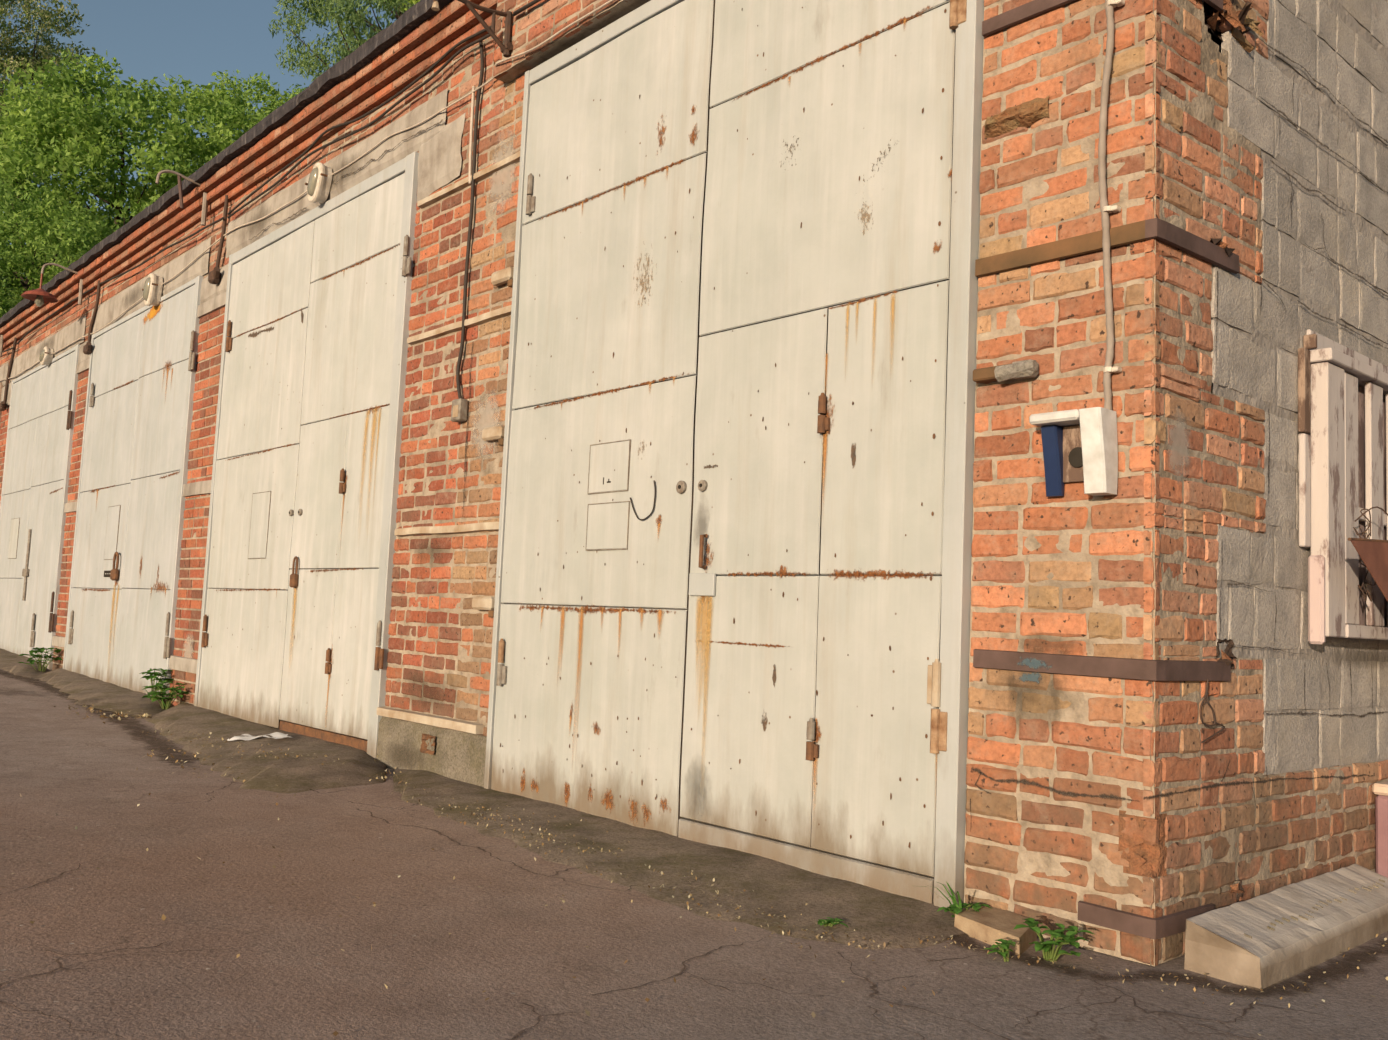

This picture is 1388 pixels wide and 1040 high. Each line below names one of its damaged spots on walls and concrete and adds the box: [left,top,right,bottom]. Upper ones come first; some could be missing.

rust [829,291,897,332]
rust [820,394,833,483]
rust [728,549,806,601]
rust [519,588,676,680]
rust [520,769,538,792]
rust [588,762,667,821]
crack [46,939,182,970]